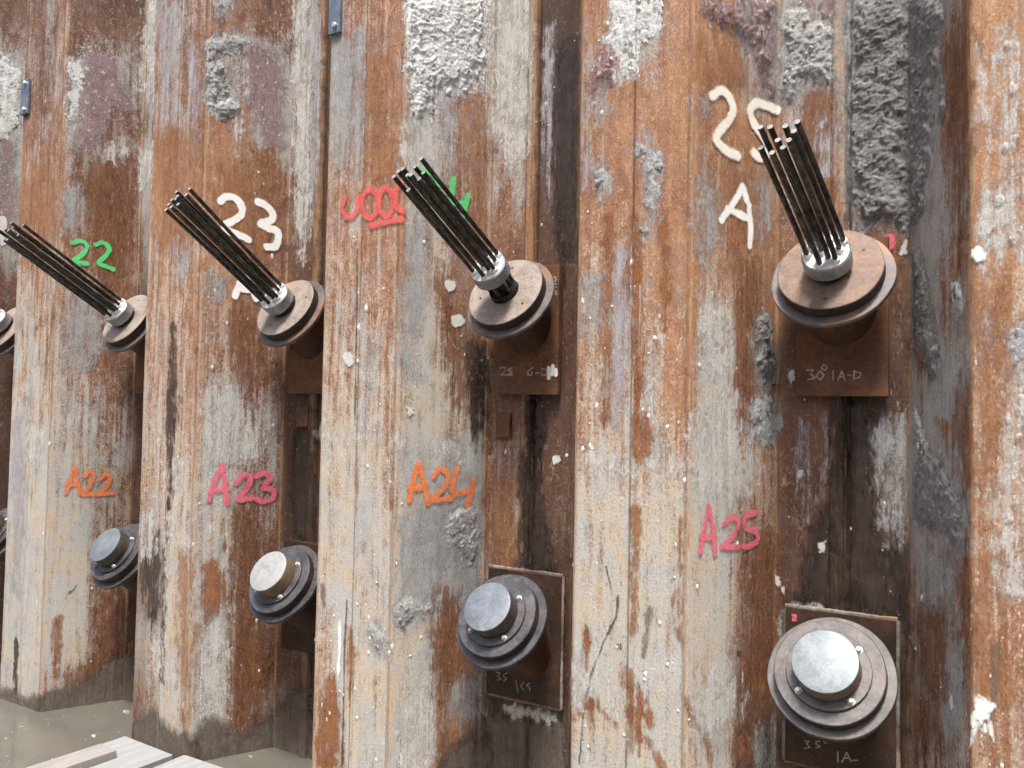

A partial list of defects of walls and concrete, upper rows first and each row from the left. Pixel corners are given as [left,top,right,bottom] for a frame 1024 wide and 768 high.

rust [150,120,285,273]
water stain [549,36,580,288]
water stain [416,340,491,467]
rust [911,12,1022,768]
water stain [0,637,135,712]
rust [50,588,135,688]
water stain [132,685,313,761]
rust [174,504,272,735]
rust [428,585,468,751]
rust [629,505,642,635]
rust [731,534,789,765]
water stain [793,396,911,768]